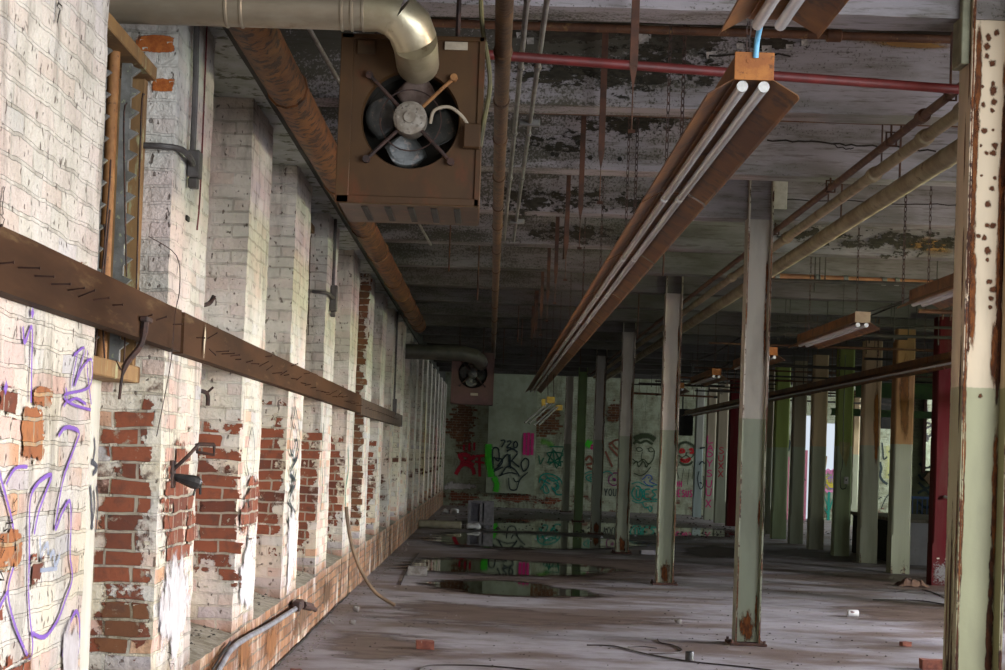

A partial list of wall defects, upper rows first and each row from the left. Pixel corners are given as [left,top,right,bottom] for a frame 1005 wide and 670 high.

peeling [512,30,808,60]
leakage [823,229,955,259]
corrosion [763,230,773,362]
corrosion [945,0,1005,670]
peeling [0,384,54,464]
peeling [89,395,286,661]
peeling [0,529,48,589]
corrosion [739,595,757,640]
peeling [0,654,31,670]